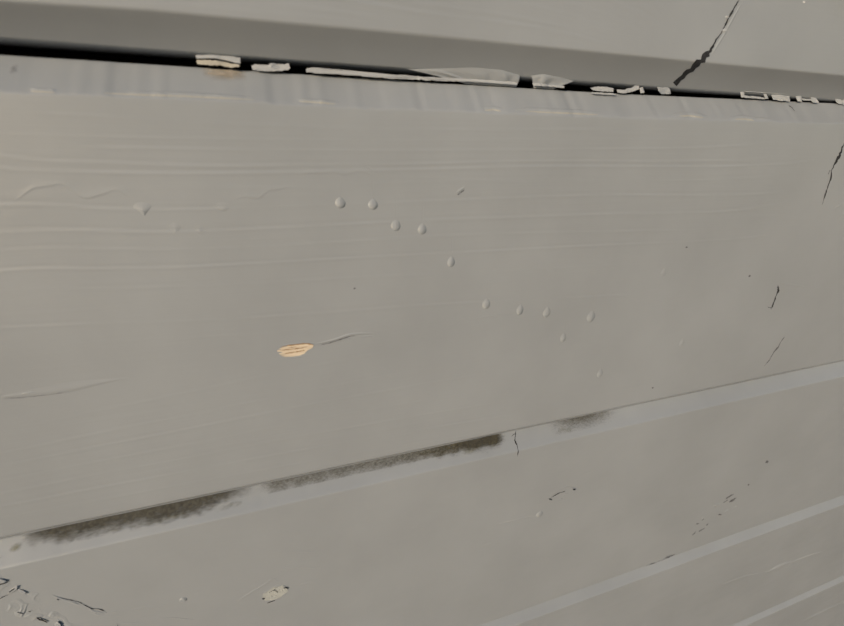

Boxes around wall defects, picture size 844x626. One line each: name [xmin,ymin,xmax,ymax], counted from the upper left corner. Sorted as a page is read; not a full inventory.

crack [673,0,743,86]
peeling [196,54,241,68]
peeling [251,63,290,72]
peeling [306,67,520,87]
peeling [531,74,573,89]
peeling [591,85,645,95]
peeling [740,91,824,103]
crack [823,144,844,204]
peeling [277,342,316,359]
damp [332,434,500,473]
damp [31,490,234,540]
peeling [0,575,81,626]